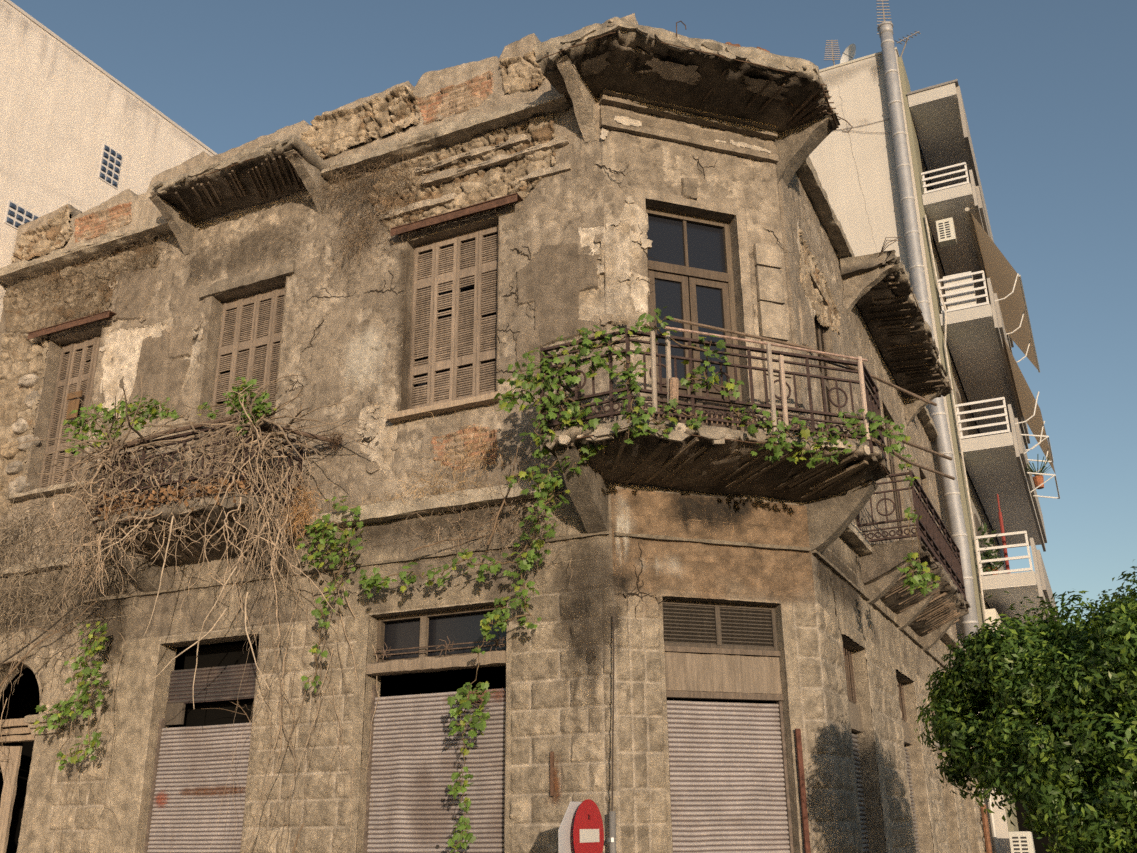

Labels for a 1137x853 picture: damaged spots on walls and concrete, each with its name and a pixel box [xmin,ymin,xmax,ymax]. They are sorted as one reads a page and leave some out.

spalling [151,13,852,194]
spalling [368,113,557,232]
spalling [11,202,133,263]
peeling [515,195,652,372]
spalling [0,238,205,515]
spalling [431,424,499,472]
water stain [676,494,750,526]
crack [616,543,669,615]